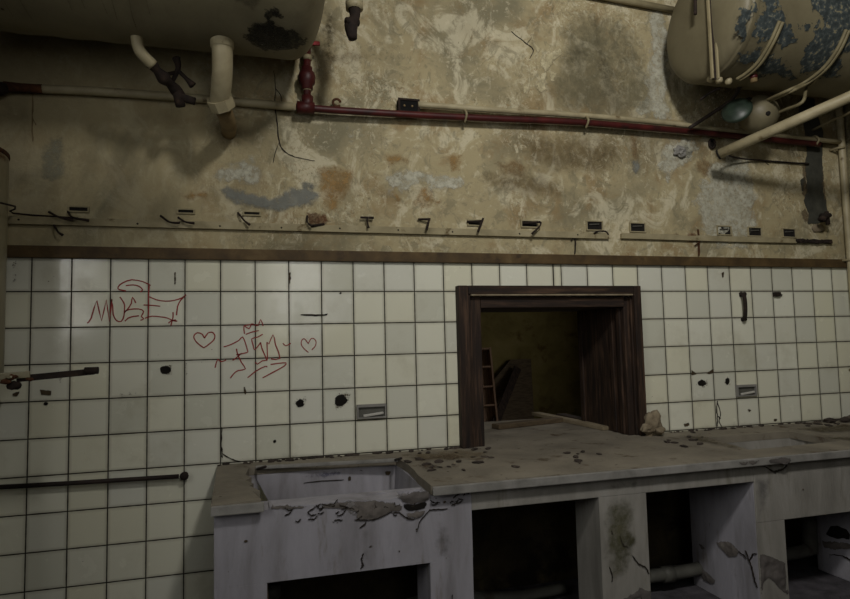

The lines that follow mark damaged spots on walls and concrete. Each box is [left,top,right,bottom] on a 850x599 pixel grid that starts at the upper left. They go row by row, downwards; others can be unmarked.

peeling [222,167,351,211]
spalling [321,491,446,520]
crack [611,531,649,574]
crack [738,550,758,588]
spalling [760,555,789,594]